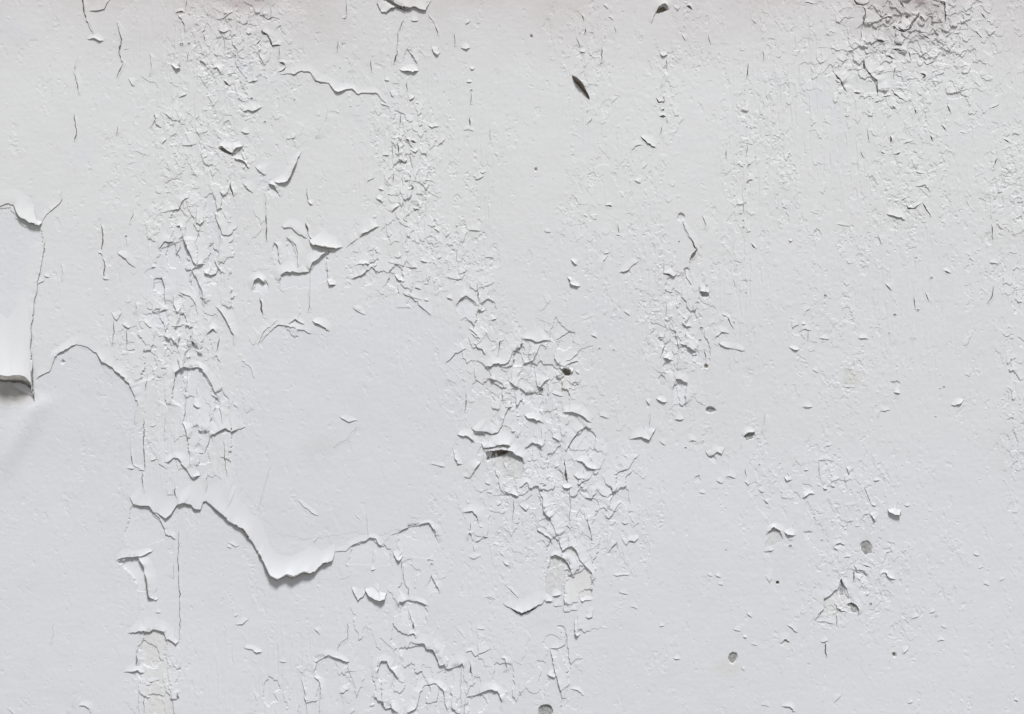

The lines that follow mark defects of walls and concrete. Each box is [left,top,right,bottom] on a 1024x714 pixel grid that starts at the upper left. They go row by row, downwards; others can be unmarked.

peeling [377,0,431,12]
peeling [171,0,268,146]
peeling [0,111,745,714]
crack [503,588,550,616]
crack [547,619,585,707]